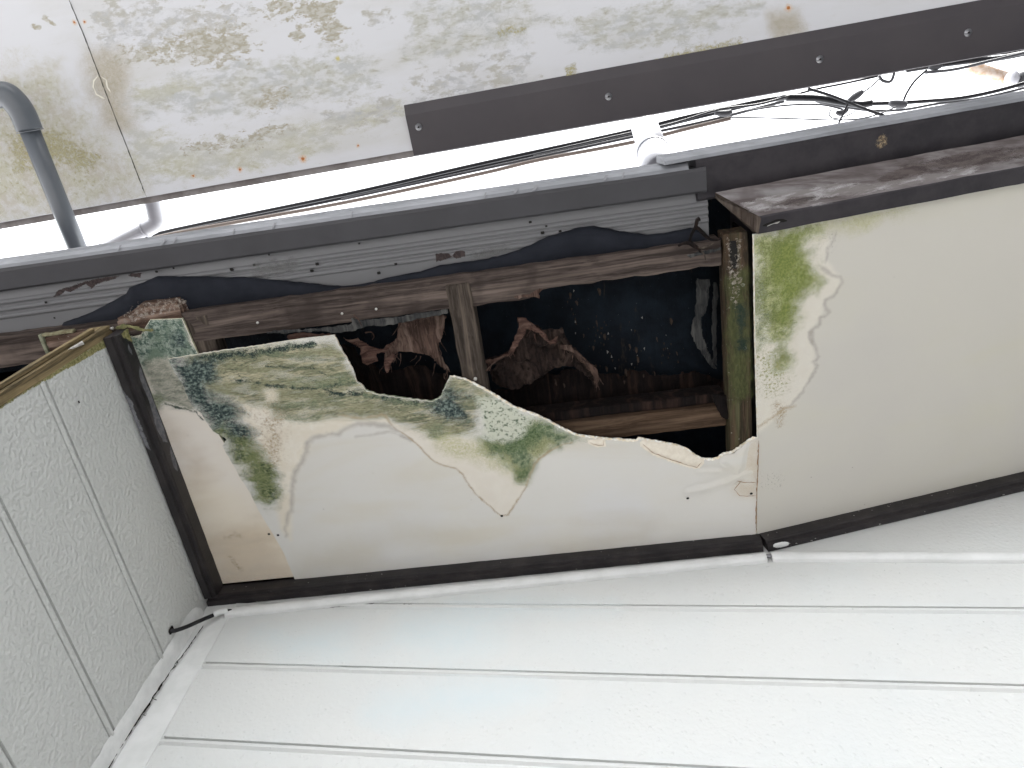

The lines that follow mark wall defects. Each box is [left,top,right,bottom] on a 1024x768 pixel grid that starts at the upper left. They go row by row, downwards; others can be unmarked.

leakage [0,0,813,222]
leakage [131,319,589,584]
peeling [435,251,465,262]
spalling [726,239,743,305]
leakage [731,205,918,501]